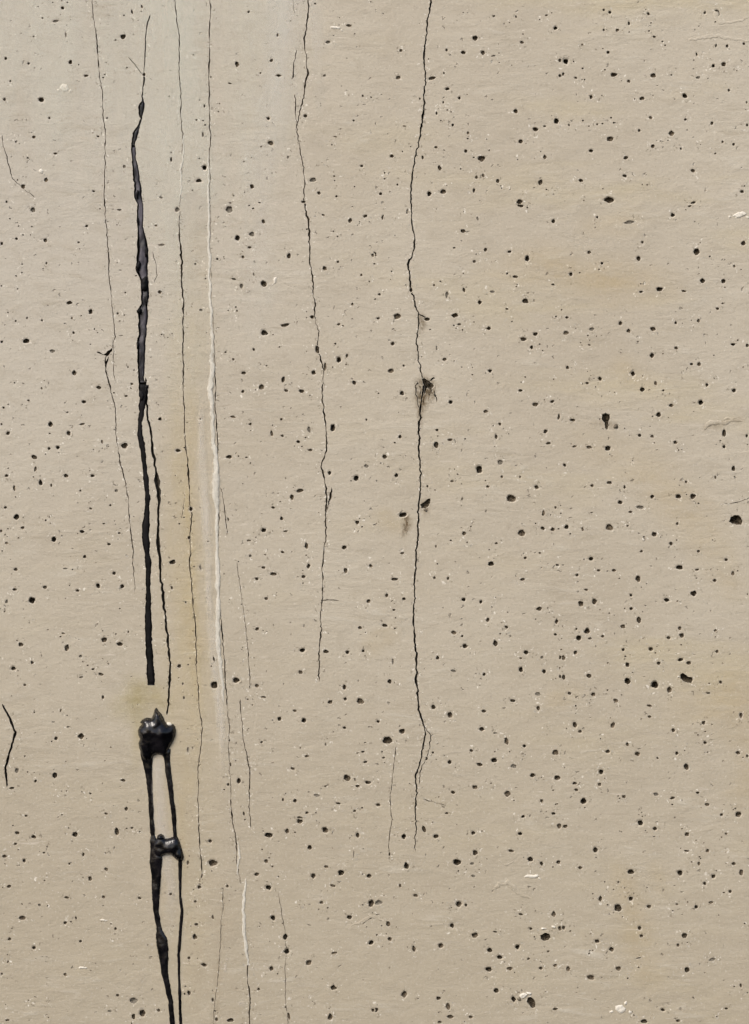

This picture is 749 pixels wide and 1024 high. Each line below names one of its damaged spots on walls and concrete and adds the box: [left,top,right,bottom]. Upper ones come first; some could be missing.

crack [2,704,17,786]
crack [92,2,251,1013]
efflorescence [207,154,225,702]
water stain [237,844,249,965]
crack [292,0,339,681]
crack [388,0,446,860]